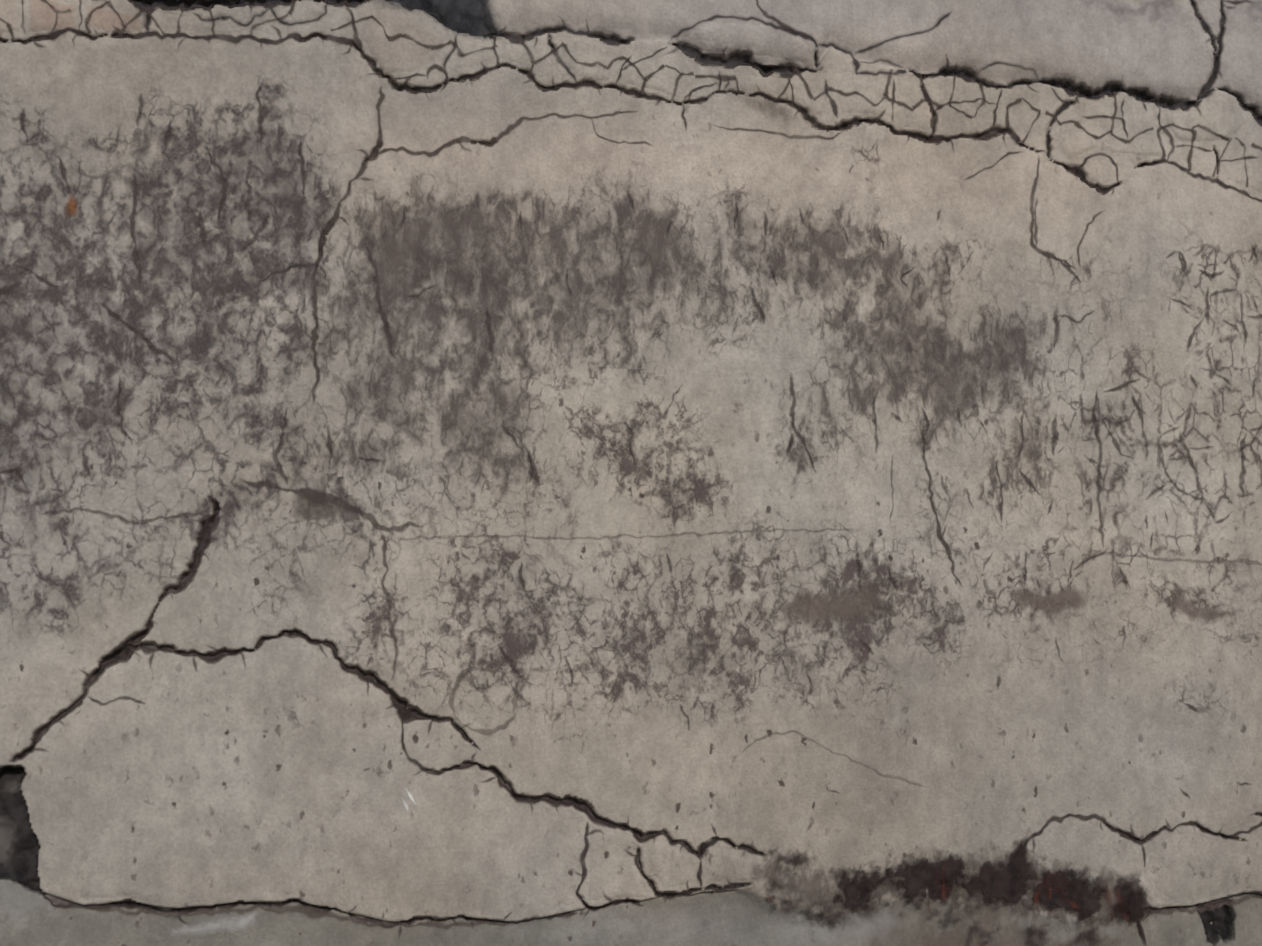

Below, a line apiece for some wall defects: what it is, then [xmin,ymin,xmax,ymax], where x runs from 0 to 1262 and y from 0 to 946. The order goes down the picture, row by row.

crack [0,0,1262,400]
damp [0,85,765,629]
damp [724,192,1262,537]
damp [354,591,405,663]
damp [421,527,965,725]
damp [984,519,1153,616]
damp [1156,557,1229,620]
crack [13,481,762,934]
spalling [0,765,45,894]
spalling [766,840,1152,946]
crack [1025,813,1262,863]
spalling [1196,900,1235,944]